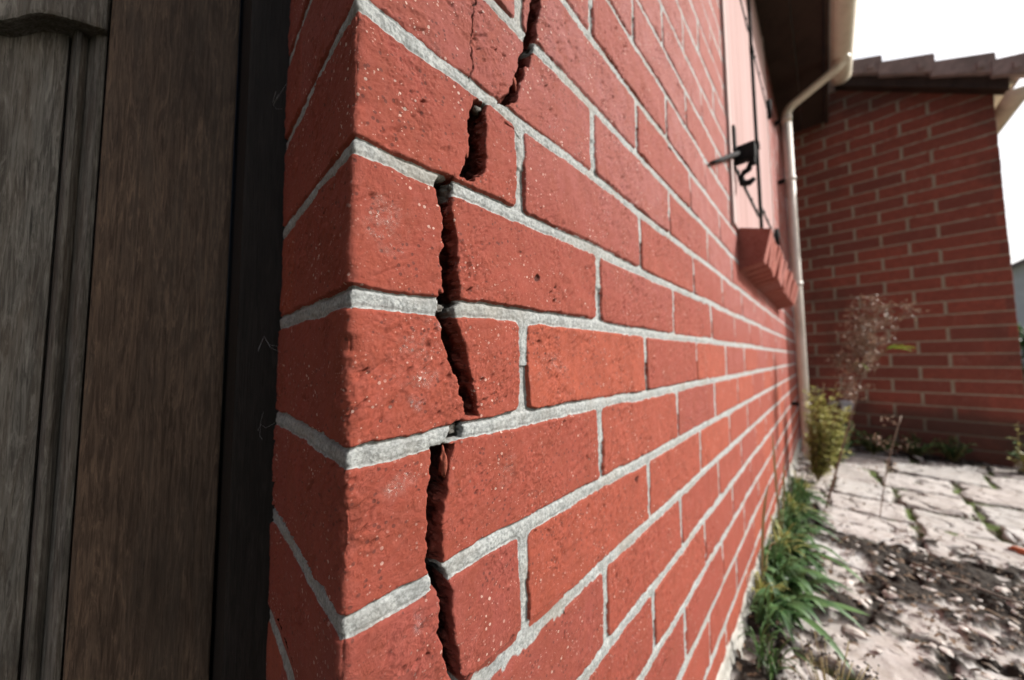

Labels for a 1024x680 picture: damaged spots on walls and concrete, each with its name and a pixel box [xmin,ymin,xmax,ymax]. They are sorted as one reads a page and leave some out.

crack [424,0,542,680]